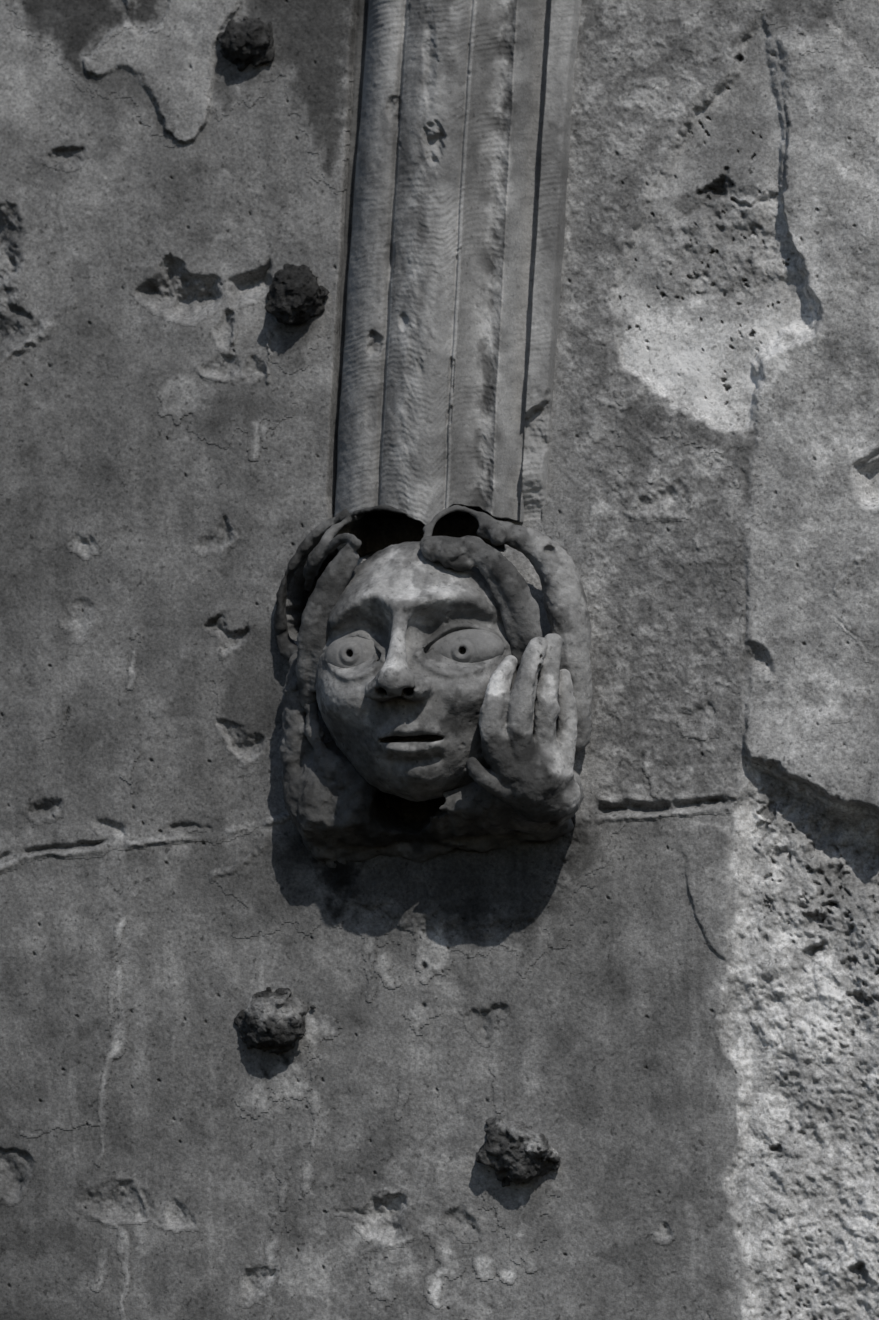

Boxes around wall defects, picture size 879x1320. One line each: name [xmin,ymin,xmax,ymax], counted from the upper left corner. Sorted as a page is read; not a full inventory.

flaking render [83,0,242,145]
spalling [0,198,78,375]
peeling [131,253,274,384]
spalling [593,2,879,1320]
crack [0,812,288,883]